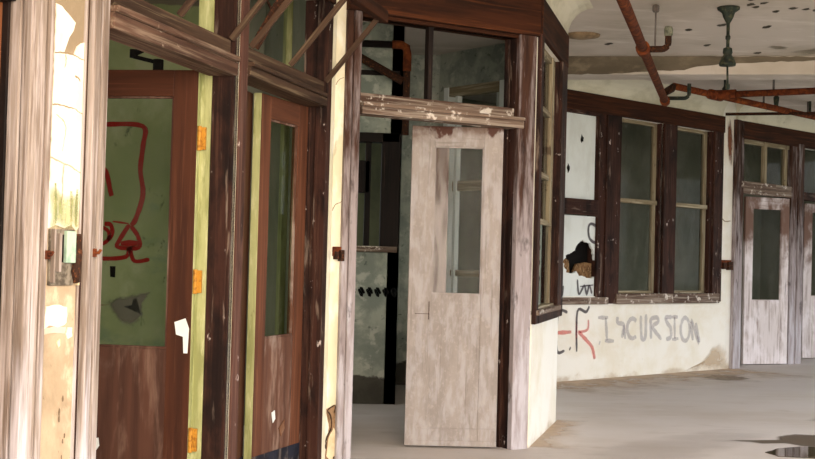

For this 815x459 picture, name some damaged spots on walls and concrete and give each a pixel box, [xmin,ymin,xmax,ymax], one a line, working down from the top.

crack [55,52,84,81]
peeling [48,3,84,231]
crack [51,103,82,203]
leakage [53,183,78,226]
peeling [44,305,72,347]
leakage [695,351,719,366]